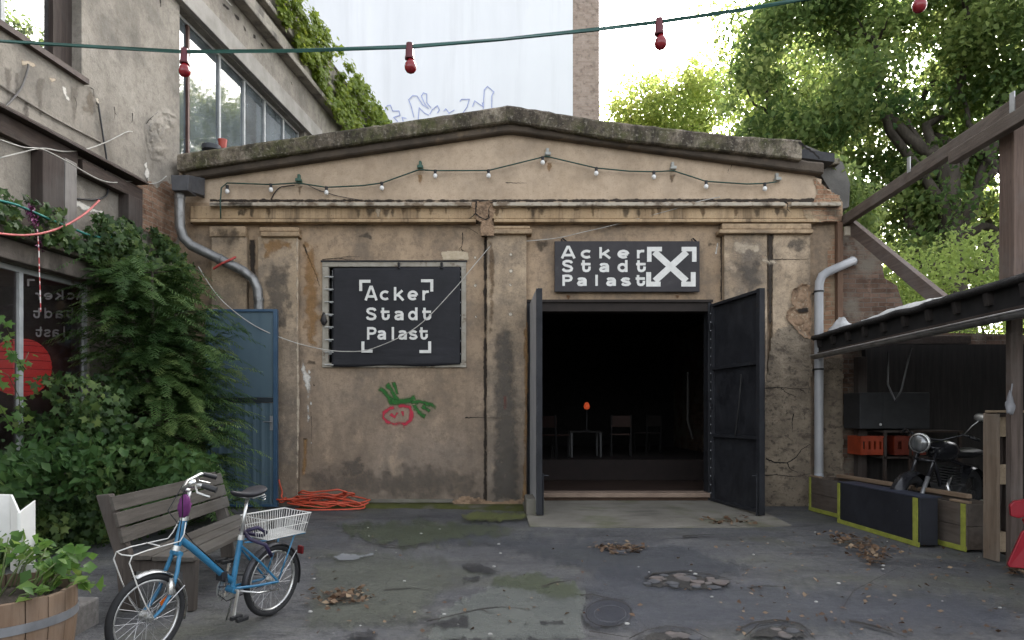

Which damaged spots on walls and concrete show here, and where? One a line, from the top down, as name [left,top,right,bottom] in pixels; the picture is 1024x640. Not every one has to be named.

spalling [472,200,496,236]
flaking render [802,179,842,222]
spalling [786,239,835,339]
damp [315,237,528,501]
crack [765,387,810,477]